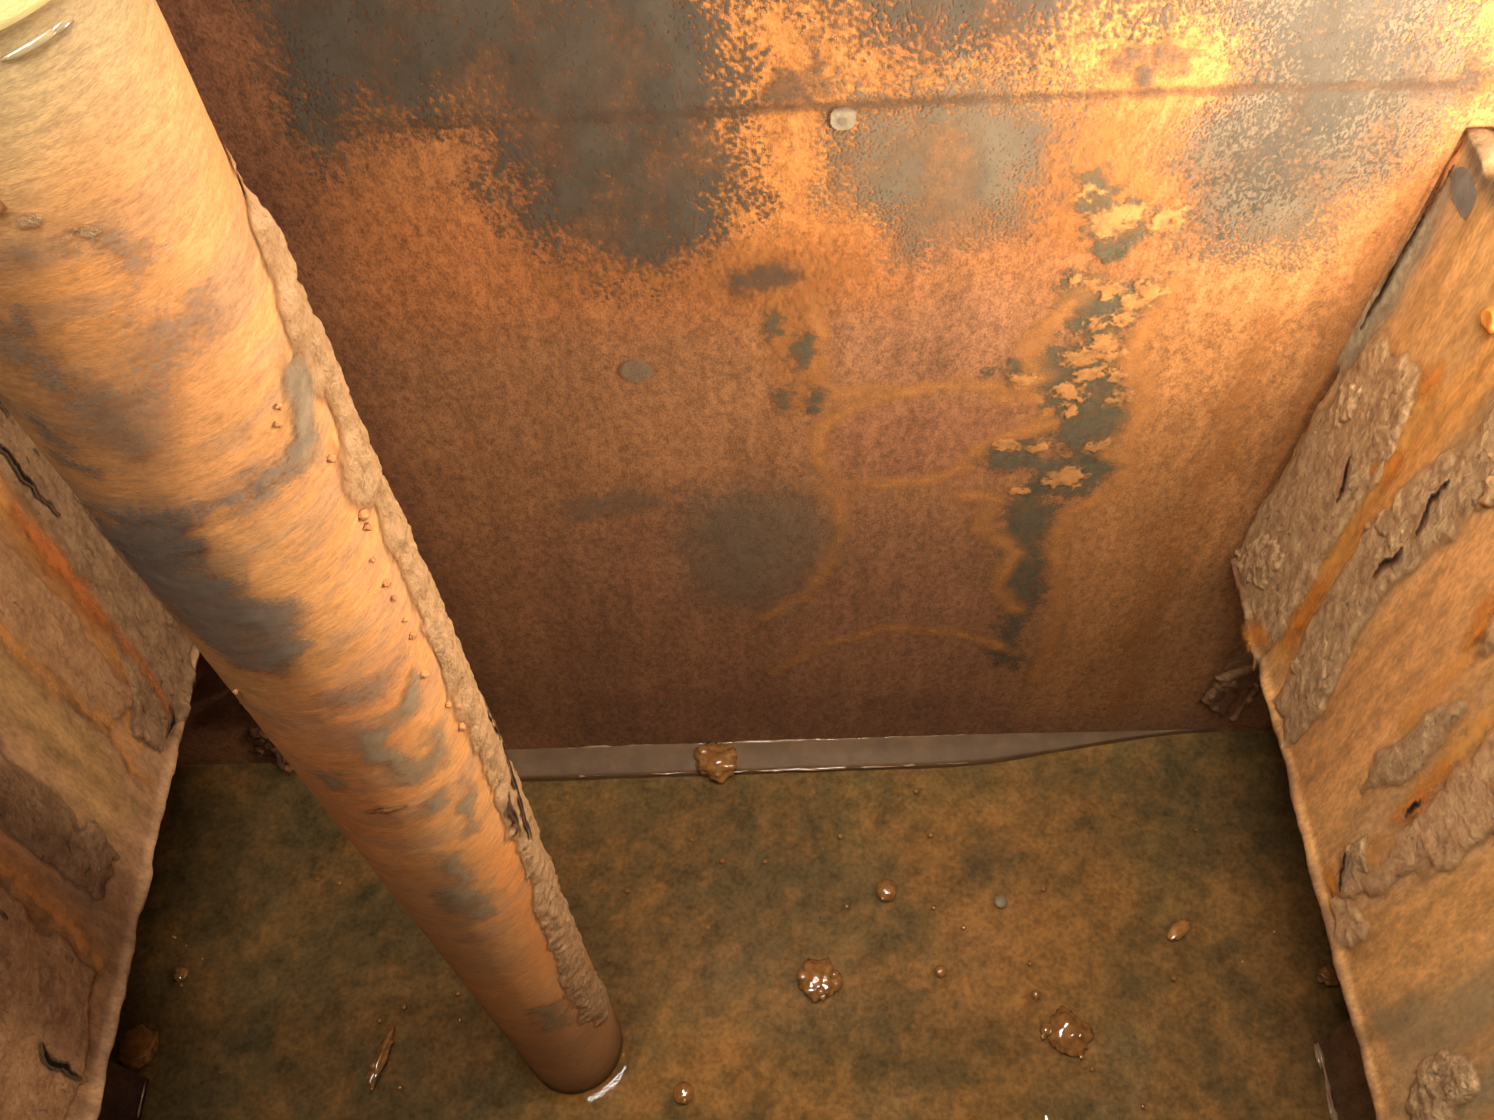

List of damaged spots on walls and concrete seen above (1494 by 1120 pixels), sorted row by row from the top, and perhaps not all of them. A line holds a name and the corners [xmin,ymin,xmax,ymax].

corrosion [0,404,196,778]
damp [0,278,226,482]
damp [75,353,320,677]
corrosion [225,146,610,1027]
corrosion [760,301,827,416]
damp [232,0,1494,685]
crack [1336,454,1352,503]
corrosion [1201,330,1494,750]
crack [1372,479,1450,577]
corrosion [1480,306,1494,335]
corrosion [0,751,120,1120]
crack [41,1042,82,1081]